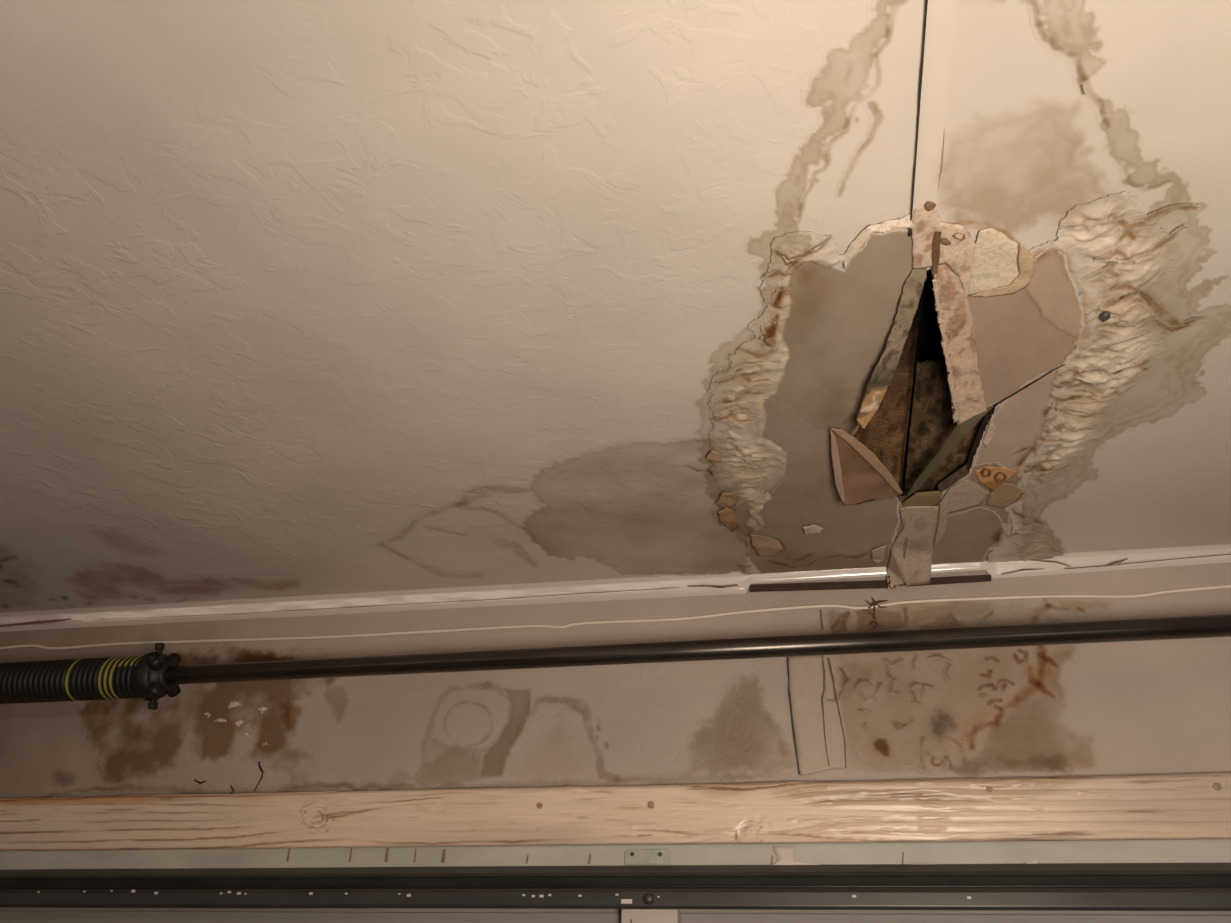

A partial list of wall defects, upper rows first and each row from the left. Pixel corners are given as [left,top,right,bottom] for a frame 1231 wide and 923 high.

water stain [372,0,913,580]
water stain [925,0,1231,554]
peeling [746,214,913,573]
peeling [931,227,1085,564]
water stain [0,523,307,611]
water stain [167,641,331,666]
water stain [31,671,798,798]
water stain [826,644,1101,779]
water stain [822,595,1115,634]
corrosion [964,645,1061,752]